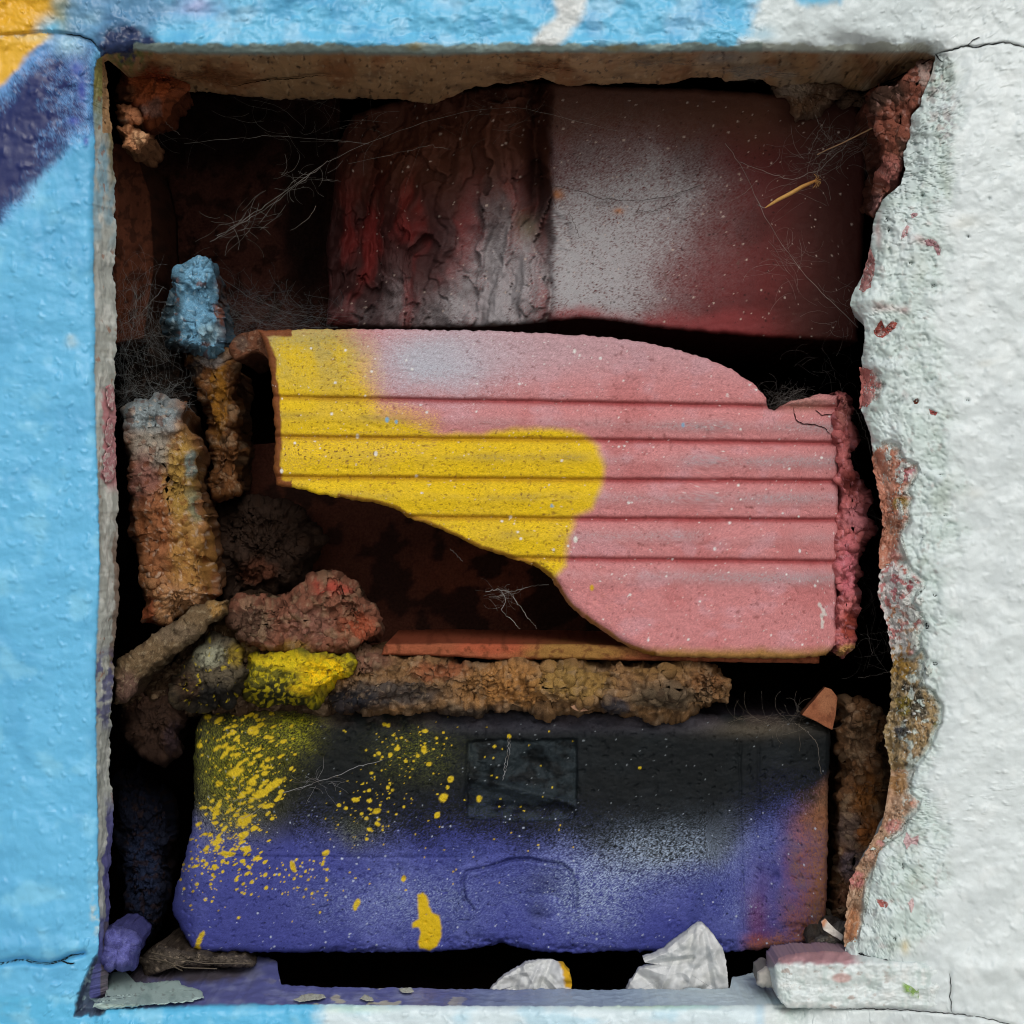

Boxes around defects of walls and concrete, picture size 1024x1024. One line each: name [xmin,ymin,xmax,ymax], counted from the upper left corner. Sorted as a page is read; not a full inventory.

crack [876,37,1022,87]
peeling [115,103,165,168]
flaking render [854,59,934,218]
peeling [925,239,941,255]
peeling [859,249,875,292]
peeling [874,321,897,338]
peeling [859,367,885,408]
peeling [102,384,116,484]
peeling [800,686,838,730]
peeling [843,441,943,947]
crack [1,954,79,965]
peeling [93,971,204,1010]